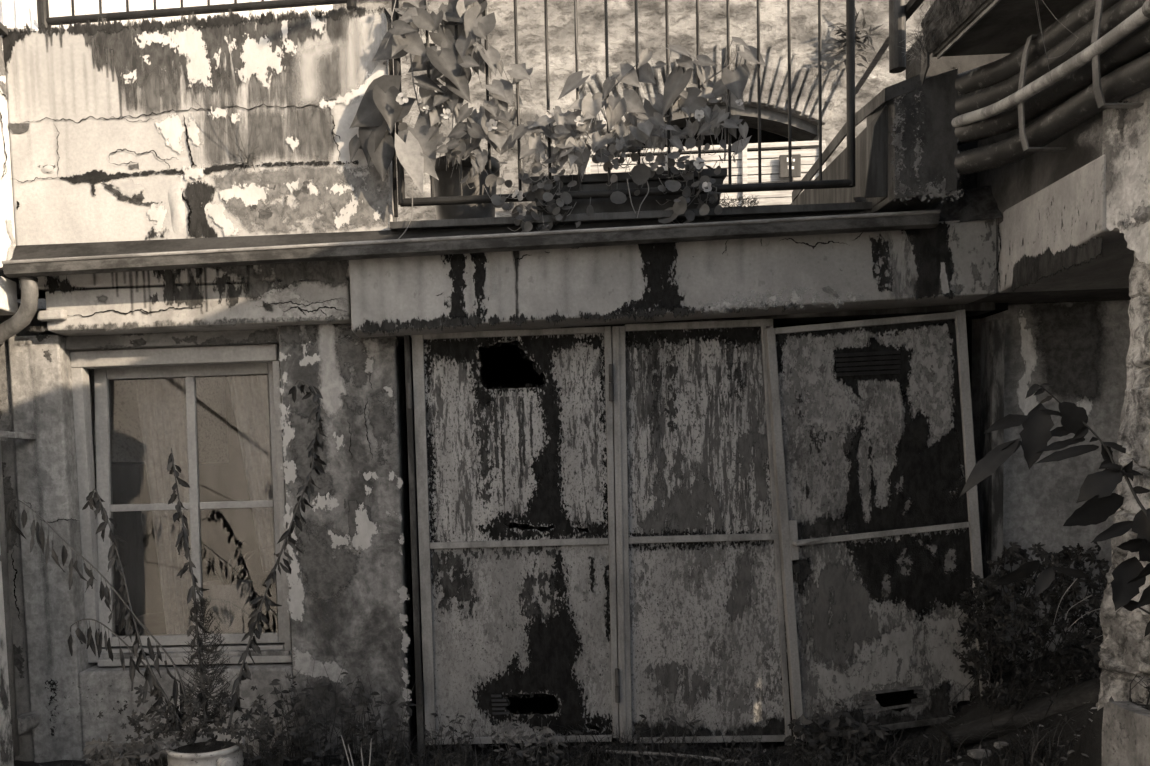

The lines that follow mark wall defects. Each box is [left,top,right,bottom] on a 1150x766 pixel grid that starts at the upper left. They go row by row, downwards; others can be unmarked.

peeling [310,14,326,35]
peeling [121,20,298,89]
peeling [319,60,387,109]
peeling [109,163,145,198]
crack [0,91,359,234]
peeling [155,113,205,184]
peeling [204,178,383,237]
leakage [44,274,95,294]
leakage [112,260,349,314]
leakage [277,324,319,350]
leakage [334,242,858,465]
peeling [311,470,405,555]